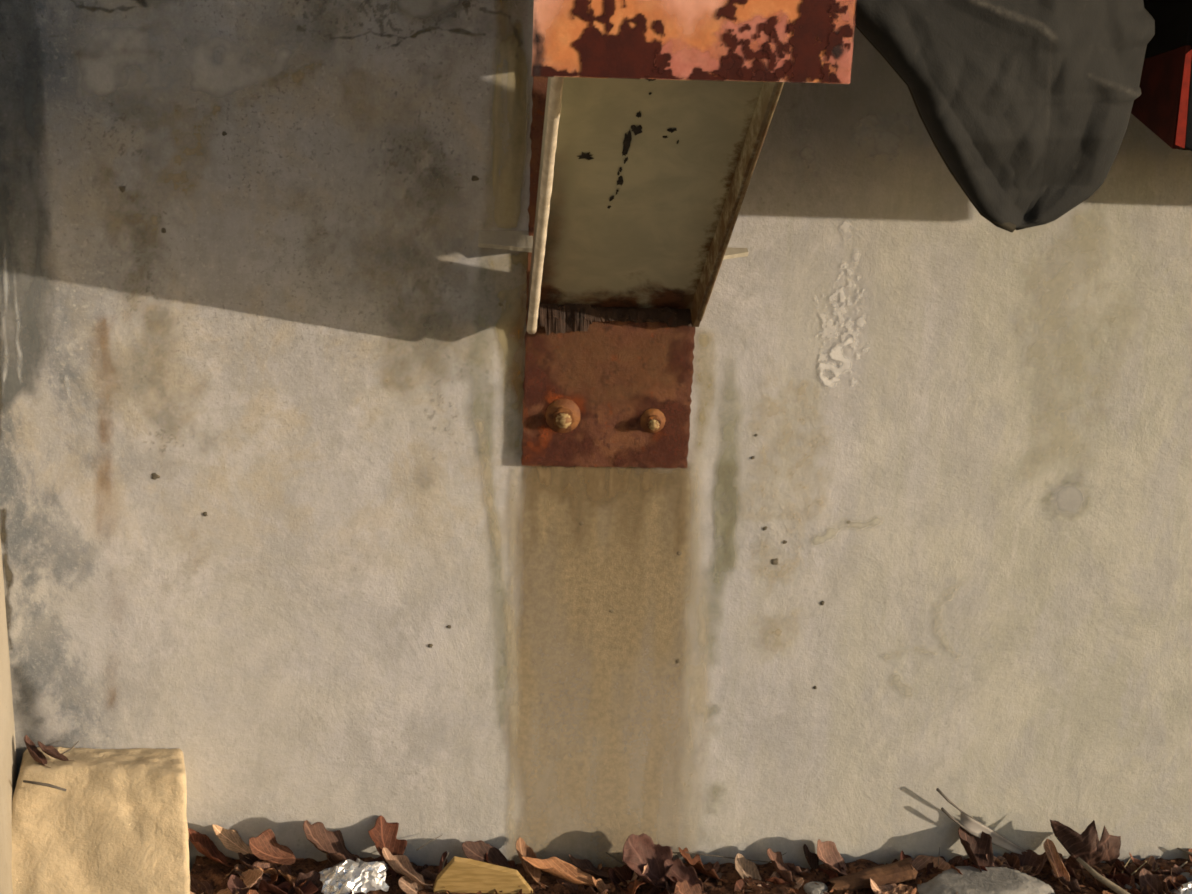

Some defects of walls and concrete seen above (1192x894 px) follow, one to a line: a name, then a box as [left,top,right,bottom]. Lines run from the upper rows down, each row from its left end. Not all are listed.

crack [77,0,146,13]
crack [383,8,522,46]
corrosion [532,0,854,95]
corrosion [607,111,642,209]
corrosion [496,252,593,466]
leakage [815,253,868,395]
corrosion [614,397,690,468]